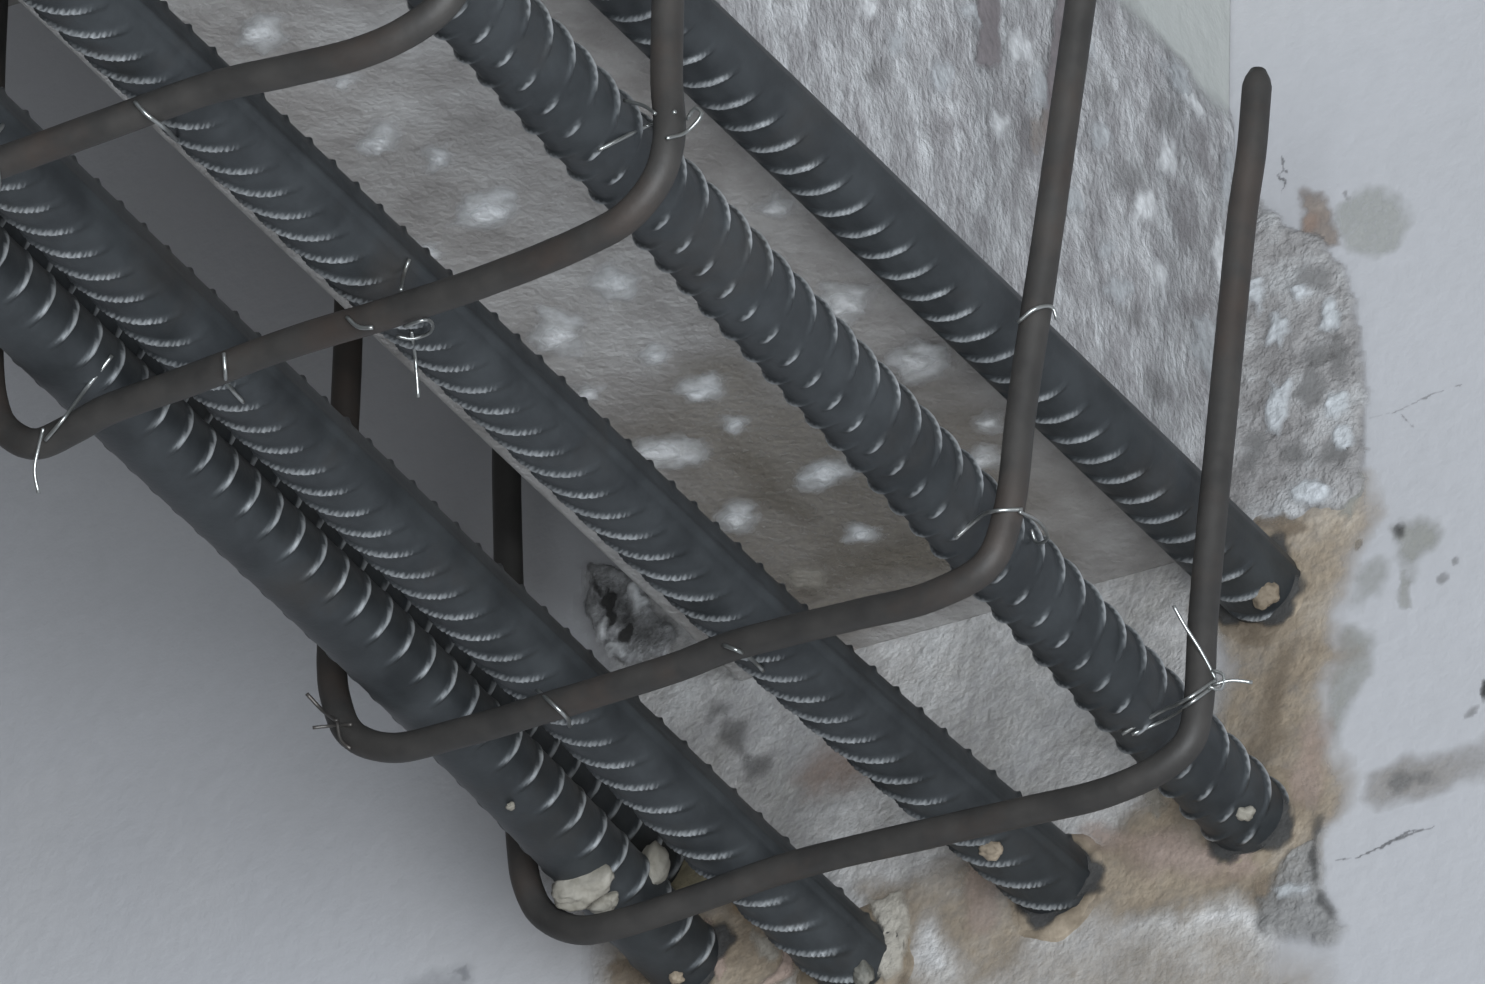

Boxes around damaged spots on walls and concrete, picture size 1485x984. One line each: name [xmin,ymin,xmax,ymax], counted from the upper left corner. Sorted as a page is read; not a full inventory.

peeling [471,206,506,223]
spalling [716,0,1058,297]
spalling [1050,0,1234,471]
spalling [1229,202,1368,520]
peeling [641,443,678,460]
flaking render [585,563,697,671]
spalling [638,665,917,849]
spalling [854,612,1136,796]
spalling [822,816,1341,984]
spalling [1052,787,1160,846]
spalling [1093,562,1191,686]
damp [1371,758,1466,801]